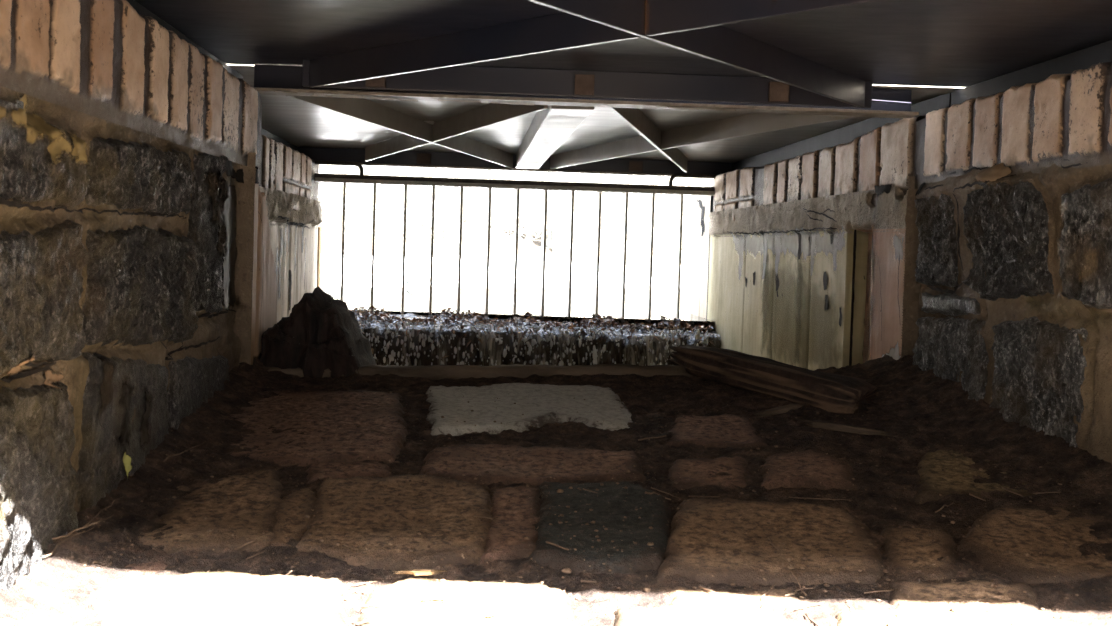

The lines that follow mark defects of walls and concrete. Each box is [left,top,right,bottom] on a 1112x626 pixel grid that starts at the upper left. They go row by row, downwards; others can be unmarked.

peeling [0,94,88,163]